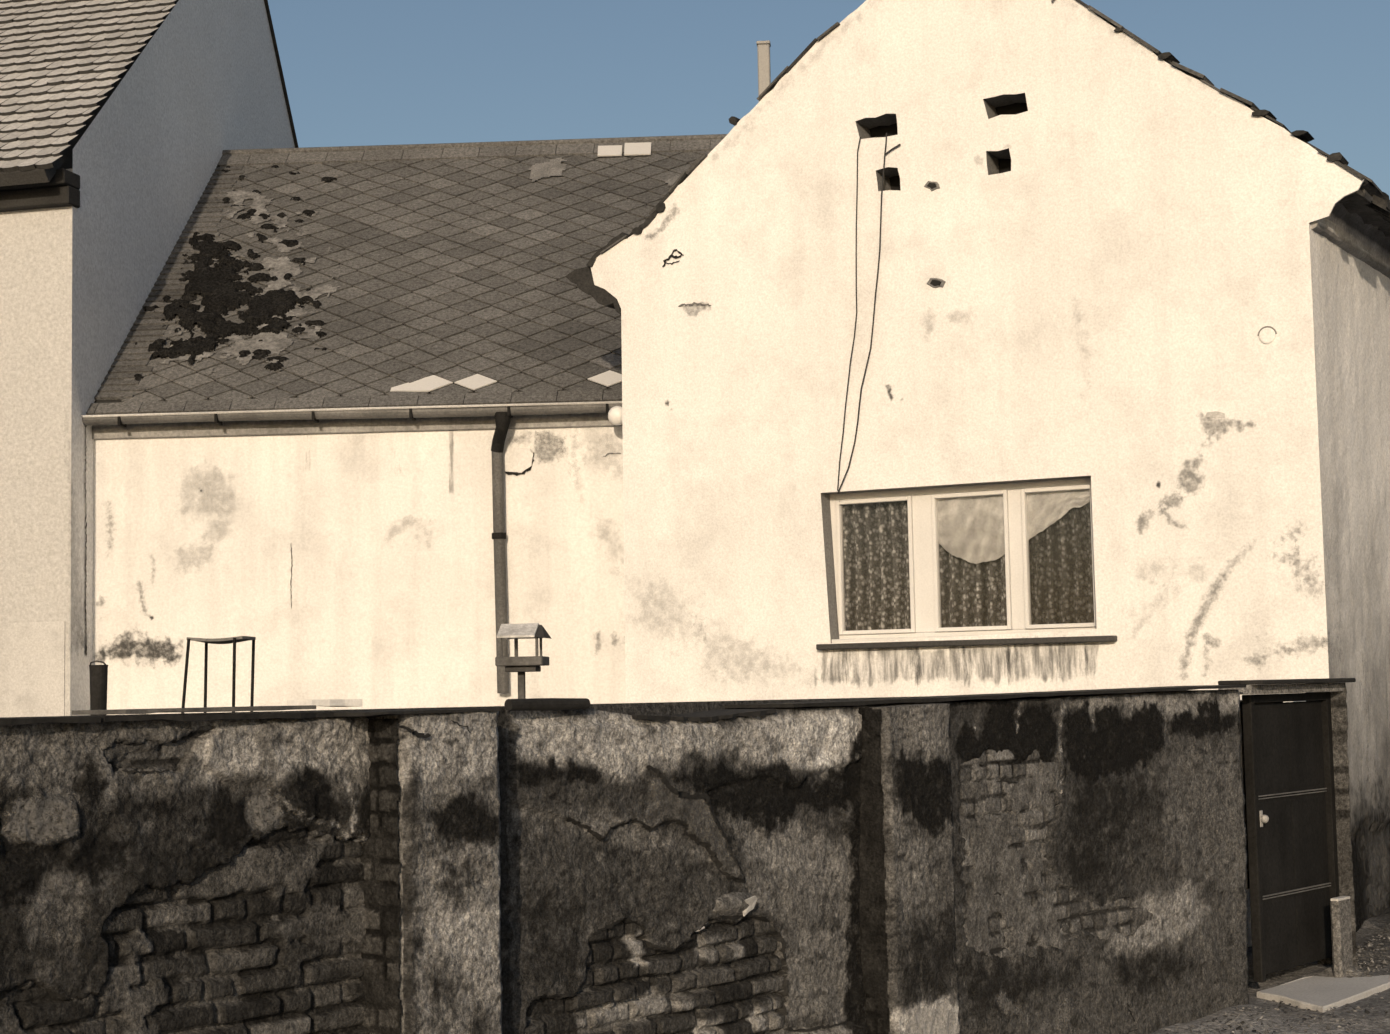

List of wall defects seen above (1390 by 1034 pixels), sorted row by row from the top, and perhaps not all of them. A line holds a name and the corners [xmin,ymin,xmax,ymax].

crack [505,452,534,476]
water stain [0,826,130,987]
water stain [74,756,109,804]
spalling [0,784,370,1034]
water stain [289,766,371,845]
peeling [470,1018,487,1034]
water stain [518,758,618,787]
spalling [524,896,785,1034]
crack [566,765,863,1032]
water stain [674,727,869,1034]
peeling [959,749,1153,959]
water stain [891,699,1242,890]